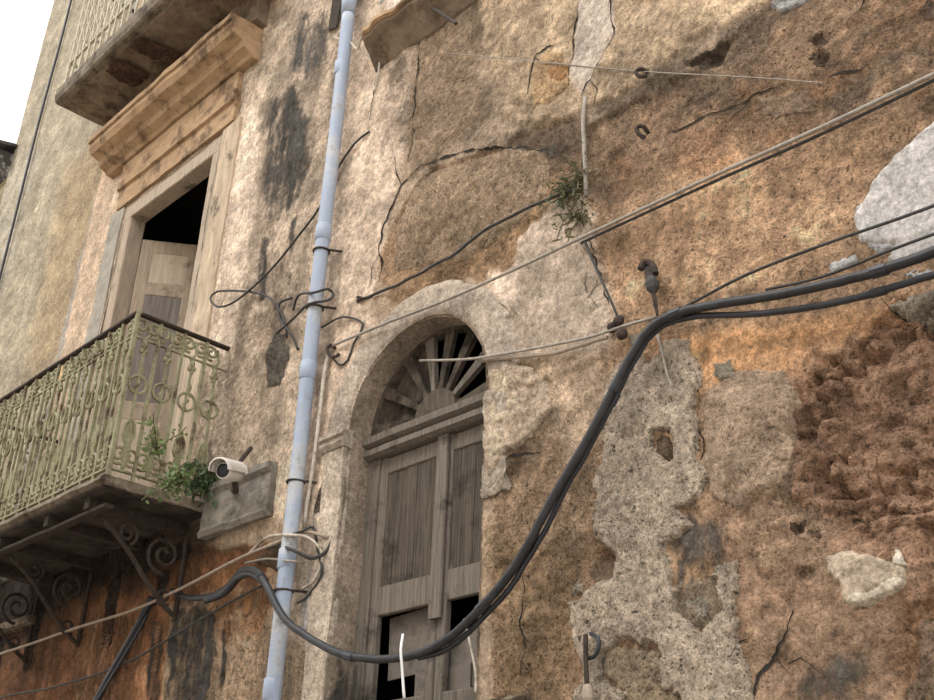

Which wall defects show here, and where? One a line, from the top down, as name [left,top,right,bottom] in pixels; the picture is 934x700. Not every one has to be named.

flaking render [106,57,149,87]
flaking render [129,37,181,67]
crack [527,0,615,102]
crack [663,83,784,135]
damp [264,86,311,250]
crack [369,45,549,285]
damp [258,238,268,300]
flaking render [789,290,934,609]
flaking render [567,338,755,700]
damp [146,607,227,700]
crack [753,610,825,699]
flaking render [905,619,934,700]